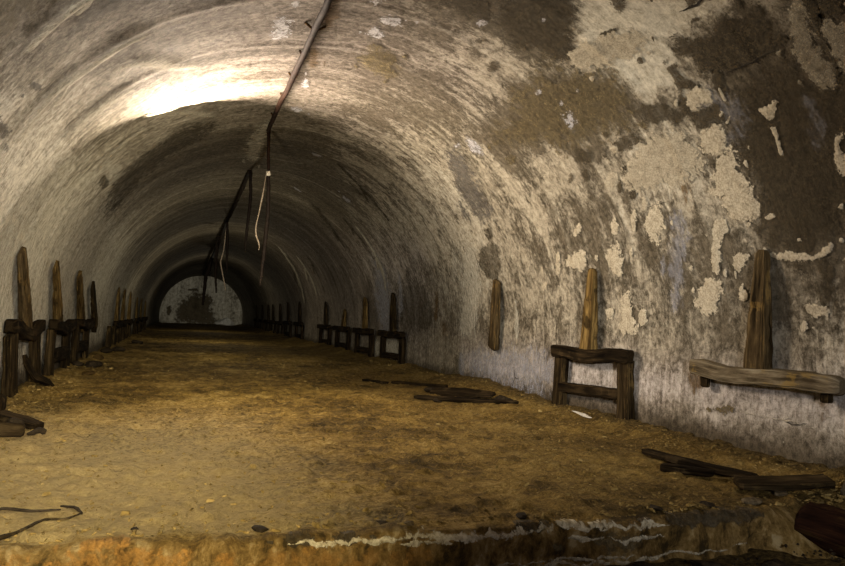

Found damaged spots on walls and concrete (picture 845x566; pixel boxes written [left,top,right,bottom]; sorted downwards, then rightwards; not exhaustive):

crack [679,0,702,12]
peeling [567,28,654,82]
damp [0,116,12,173]
spalling [568,148,591,183]
spalling [603,0,794,319]
damp [717,57,845,275]
peeling [834,131,845,176]
peeling [555,218,633,279]
peeling [763,237,844,263]
damp [0,210,29,365]
peeling [605,290,648,338]
peeling [800,303,830,333]